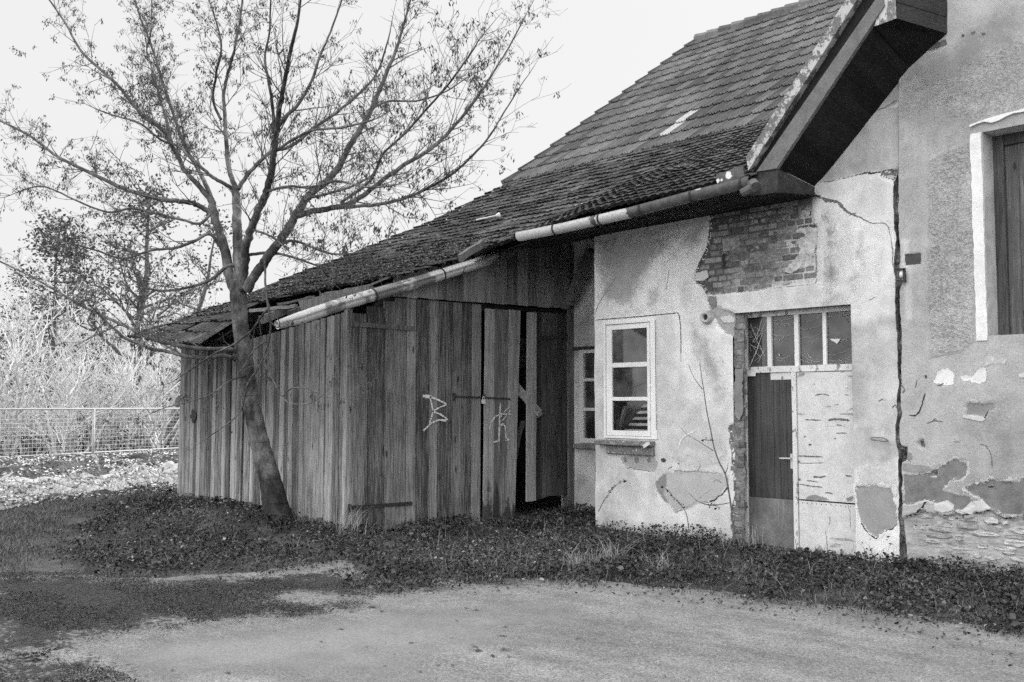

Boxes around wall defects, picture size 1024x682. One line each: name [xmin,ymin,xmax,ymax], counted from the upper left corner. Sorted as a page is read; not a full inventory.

flaking render [621,456,658,471]
flaking render [694,197,818,543]
peeling [798,436,833,501]
crack [815,142,1024,562]
flaking render [845,447,1024,577]
flaking render [963,398,994,421]